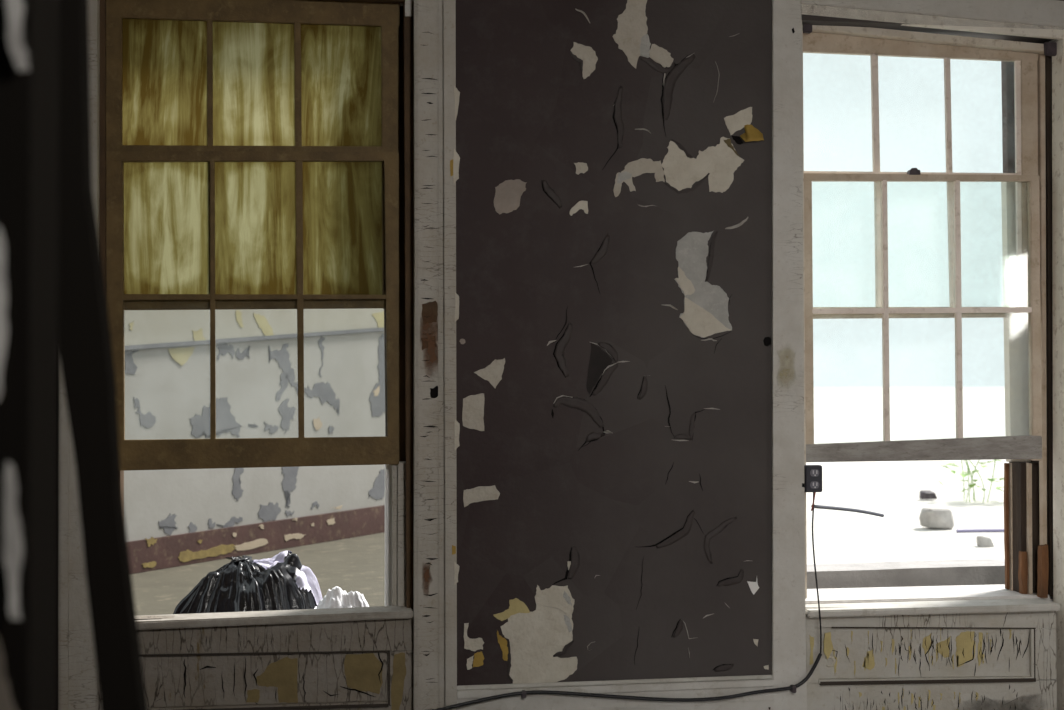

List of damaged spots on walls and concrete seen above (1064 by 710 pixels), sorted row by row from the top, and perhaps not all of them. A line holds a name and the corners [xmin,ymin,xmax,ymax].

peeling [570,42,598,79]
peeling [613,0,676,87]
peeling [570,201,588,216]
peeling [574,162,588,175]
peeling [613,107,764,197]
peeling [661,217,749,353]
peeling [189,309,340,438]
peeling [369,311,385,417]
peeling [144,467,342,562]
crack [547,306,750,663]
peeling [464,623,484,670]
peeling [494,585,578,684]